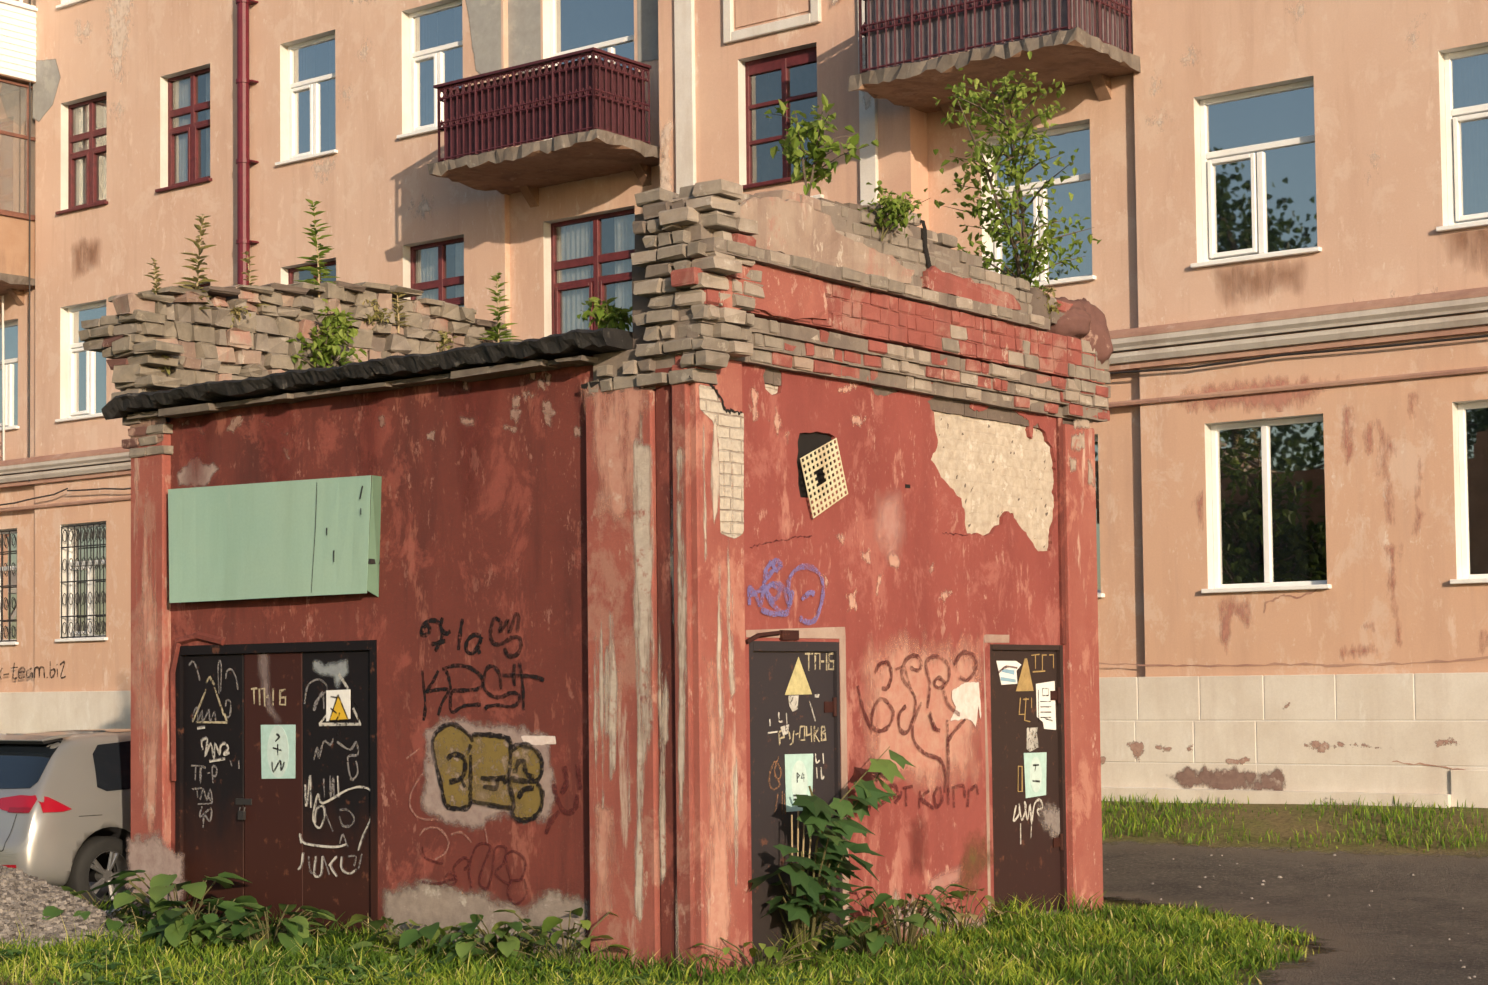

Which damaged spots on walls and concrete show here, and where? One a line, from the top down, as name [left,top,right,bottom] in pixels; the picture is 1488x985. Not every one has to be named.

peeling [504,373,555,433]
spalling [699,384,789,558]
spalling [931,411,1095,551]
peeling [846,590,857,610]
peeling [862,548,900,593]
flaking render [384,386,686,967]
peeling [706,564,738,949]
peeling [1127,741,1193,760]
peeling [1304,741,1379,753]